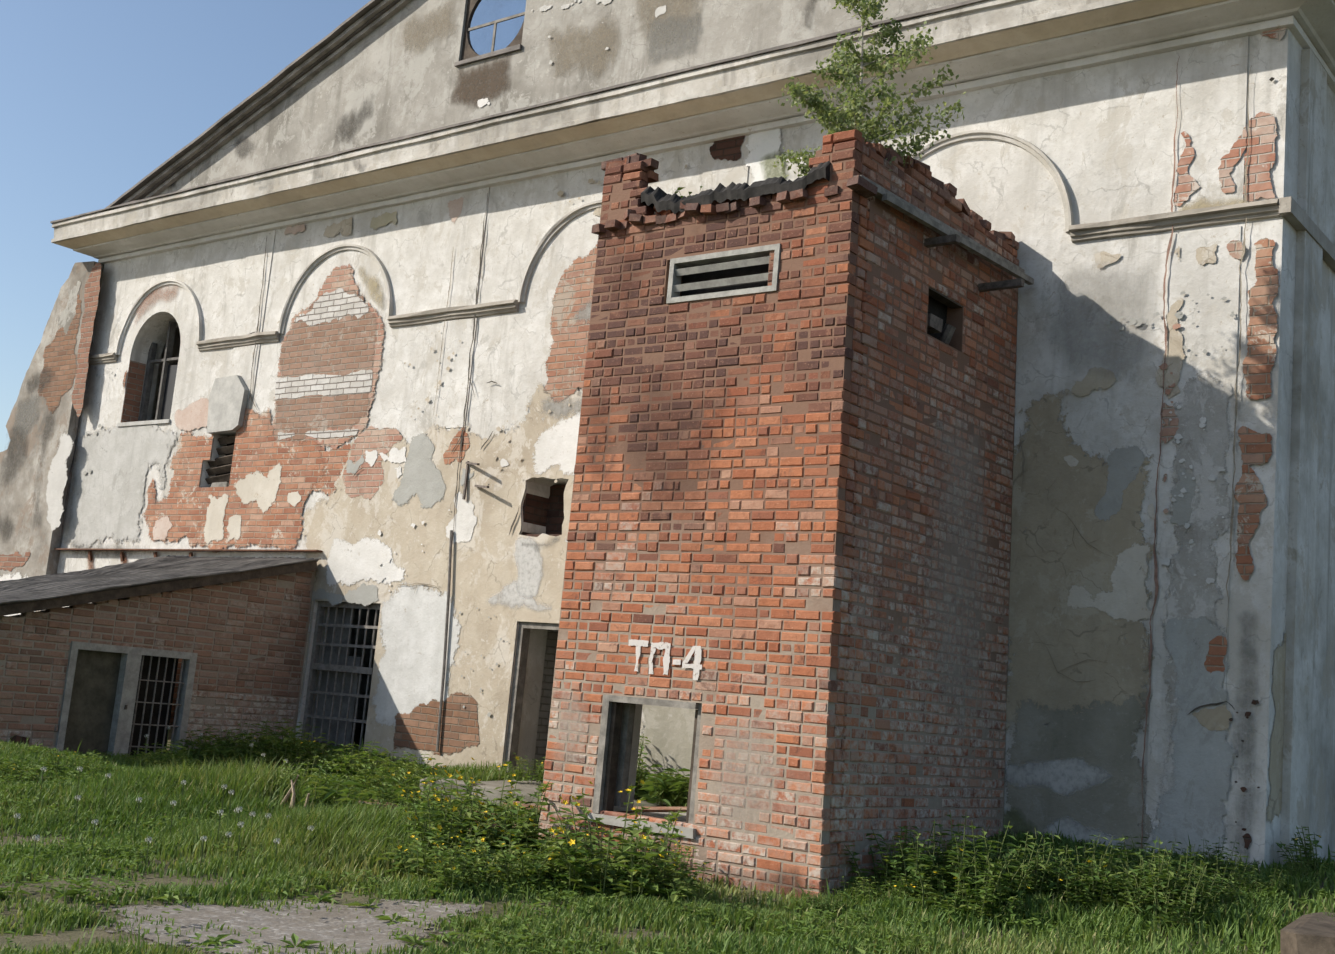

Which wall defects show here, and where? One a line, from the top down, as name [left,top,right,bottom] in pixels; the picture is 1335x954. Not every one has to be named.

damp [452,59,509,105]
damp [640,0,699,60]
spalling [1173,131,1200,206]
spalling [1218,112,1277,202]
spalling [38,263,127,436]
crack [433,193,498,544]
peeling [138,264,582,770]
peeling [1006,238,1279,796]
peeling [1229,633,1286,823]
spalling [1235,821,1252,849]